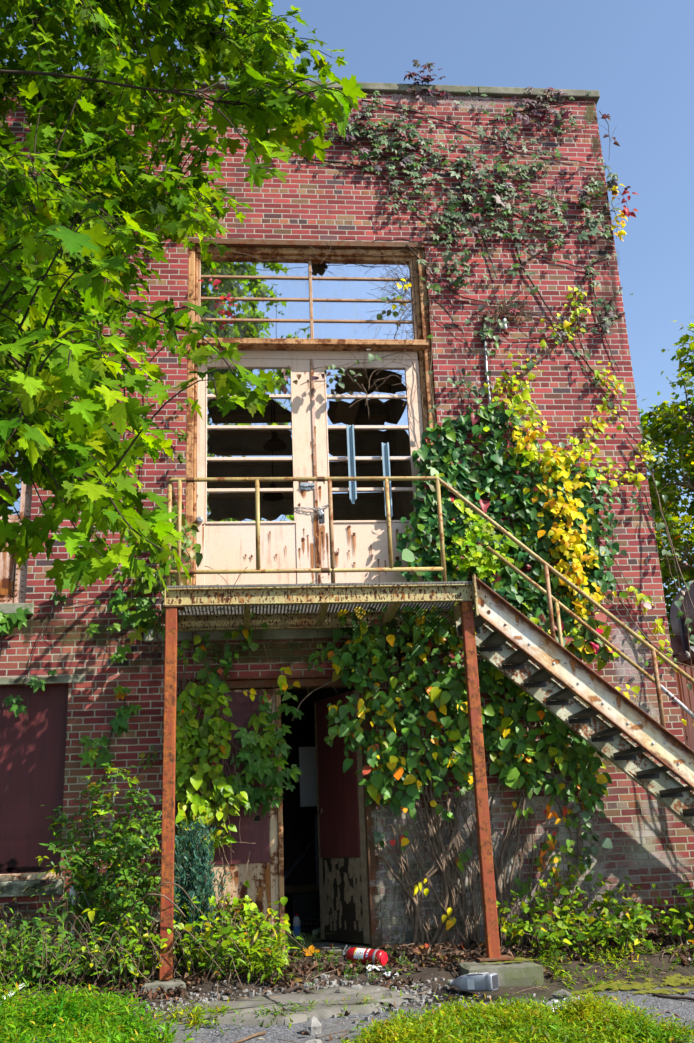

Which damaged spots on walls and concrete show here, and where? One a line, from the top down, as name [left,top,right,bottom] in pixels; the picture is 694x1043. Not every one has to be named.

rust [0,539,16,598]
rust [177,481,459,604]
rust [674,659,694,764]
peeling [322,857,364,931]